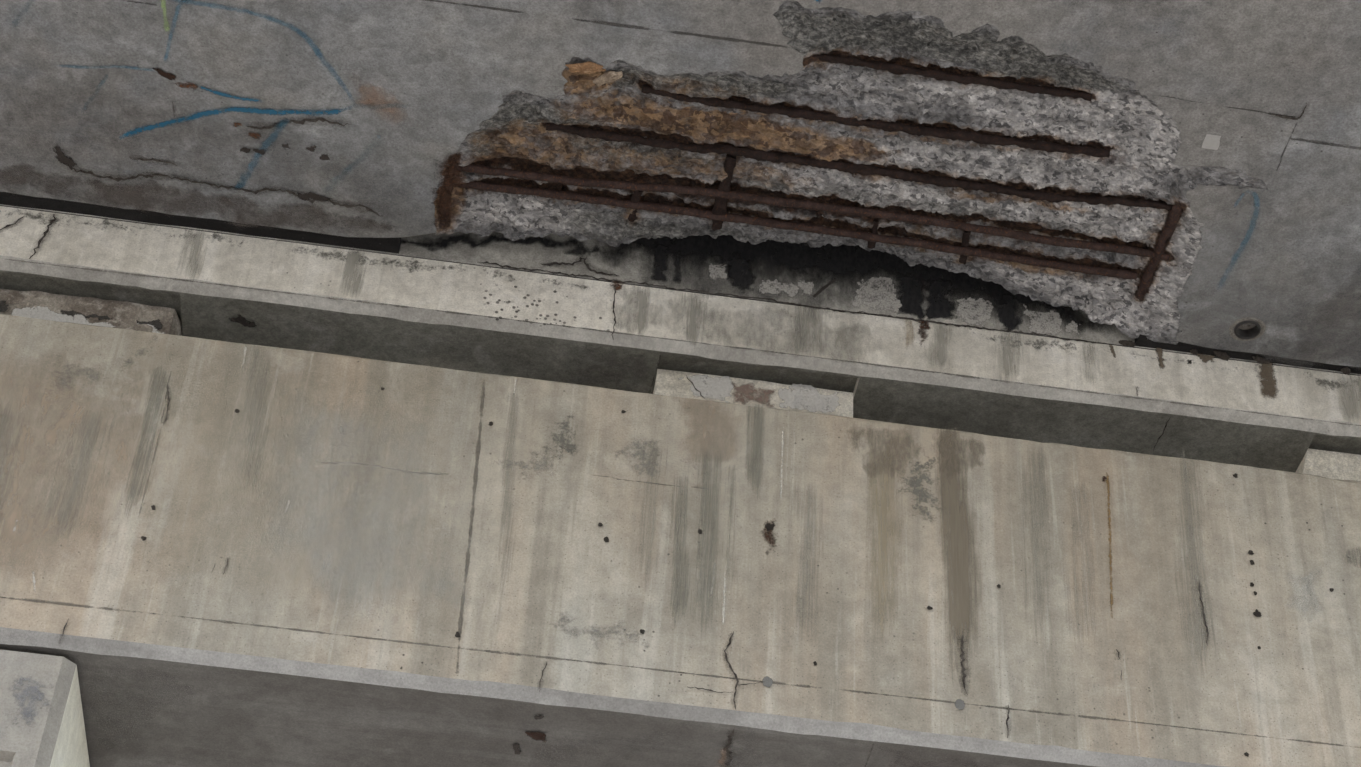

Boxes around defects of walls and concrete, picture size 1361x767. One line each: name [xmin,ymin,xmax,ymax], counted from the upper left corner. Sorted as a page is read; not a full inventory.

crack [53,147,379,216]
crack [234,117,350,160]
rust [433,154,462,224]
spalling [434,0,1268,345]
leakage [853,431,981,647]
rust [1102,473,1113,618]
crack [688,632,760,767]